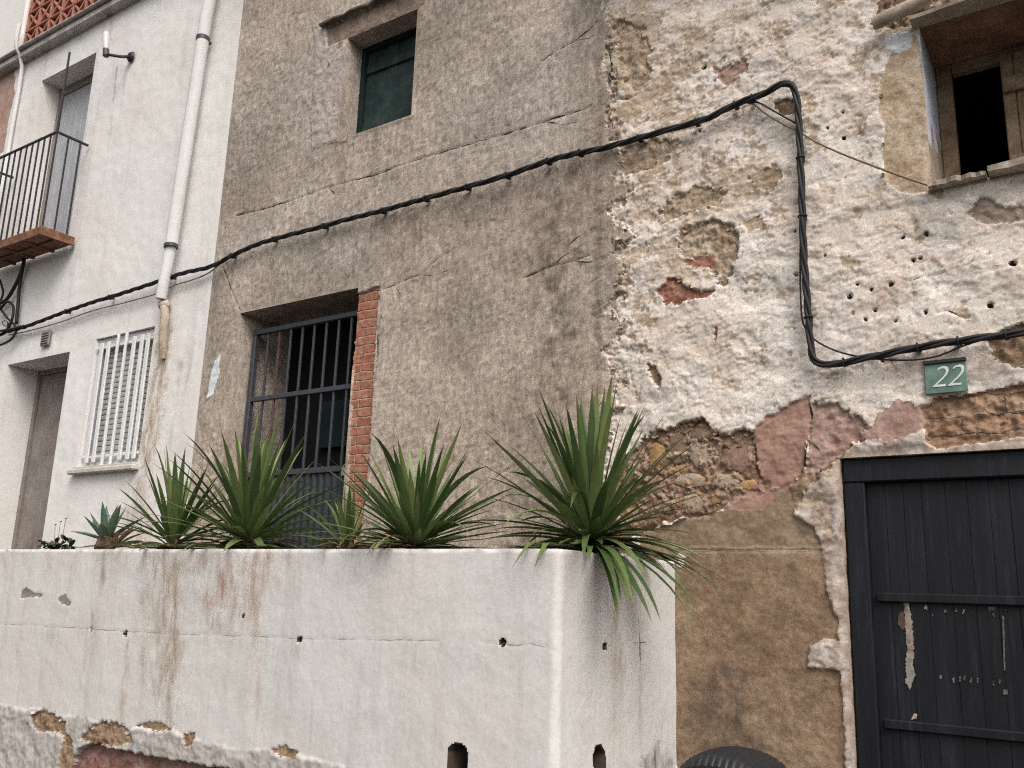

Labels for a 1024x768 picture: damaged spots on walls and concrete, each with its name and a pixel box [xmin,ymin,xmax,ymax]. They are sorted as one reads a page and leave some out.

flaking render [870,0,907,26]
flaking render [701,58,748,86]
flaking render [877,0,954,199]
flaking render [587,0,682,432]
flaking render [966,197,1024,224]
crack [526,227,594,277]
flaking render [657,185,765,306]
crack [800,399,821,479]
flaking render [613,384,1024,549]
peeling [21,587,43,598]
flaking render [31,710,224,768]
flaking render [271,744,299,759]